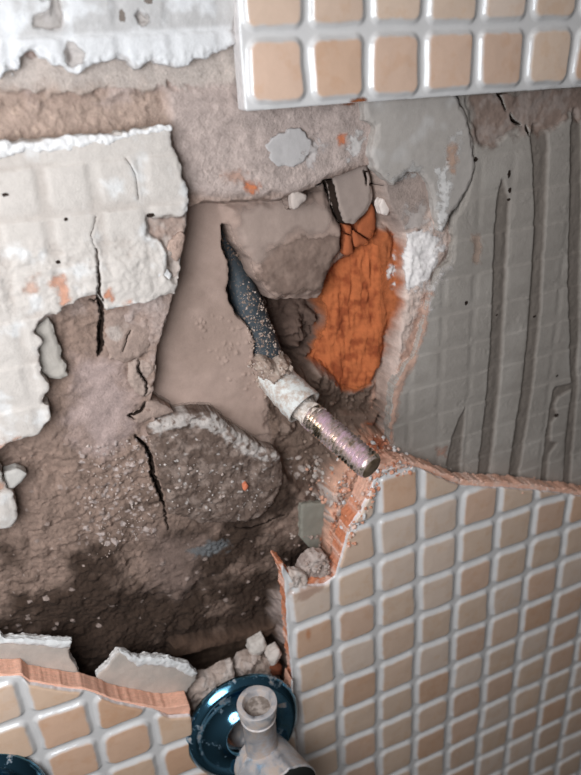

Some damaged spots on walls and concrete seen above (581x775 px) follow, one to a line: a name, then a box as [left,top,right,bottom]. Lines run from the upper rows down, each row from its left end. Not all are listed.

peeling [33,0,62,30]
peeling [64,42,85,67]
crack [496,93,529,134]
crack [317,179,343,223]
spalling [374,197,389,216]
crack [90,217,104,355]
spalling [148,191,340,436]
flaking render [310,231,387,390]
crack [122,330,169,530]